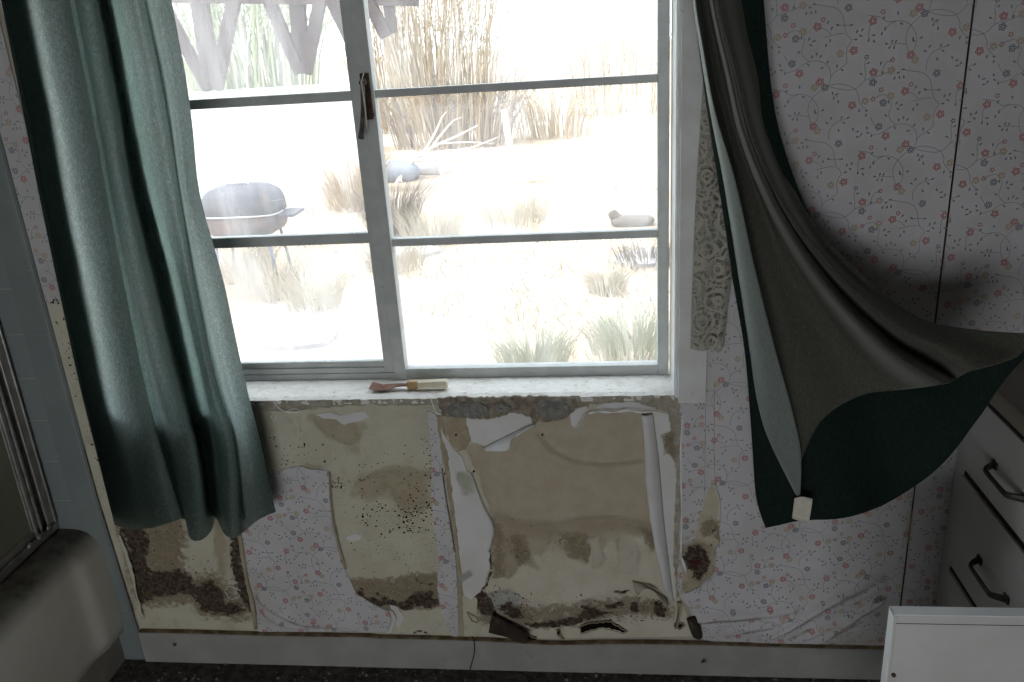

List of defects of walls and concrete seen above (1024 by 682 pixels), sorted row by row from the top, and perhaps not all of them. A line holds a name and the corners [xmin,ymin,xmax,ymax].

peeling [47,299,259,631]
water stain [114,519,257,623]
water stain [270,411,374,470]
water stain [331,435,446,611]
peeling [250,395,721,642]
water stain [465,409,720,630]